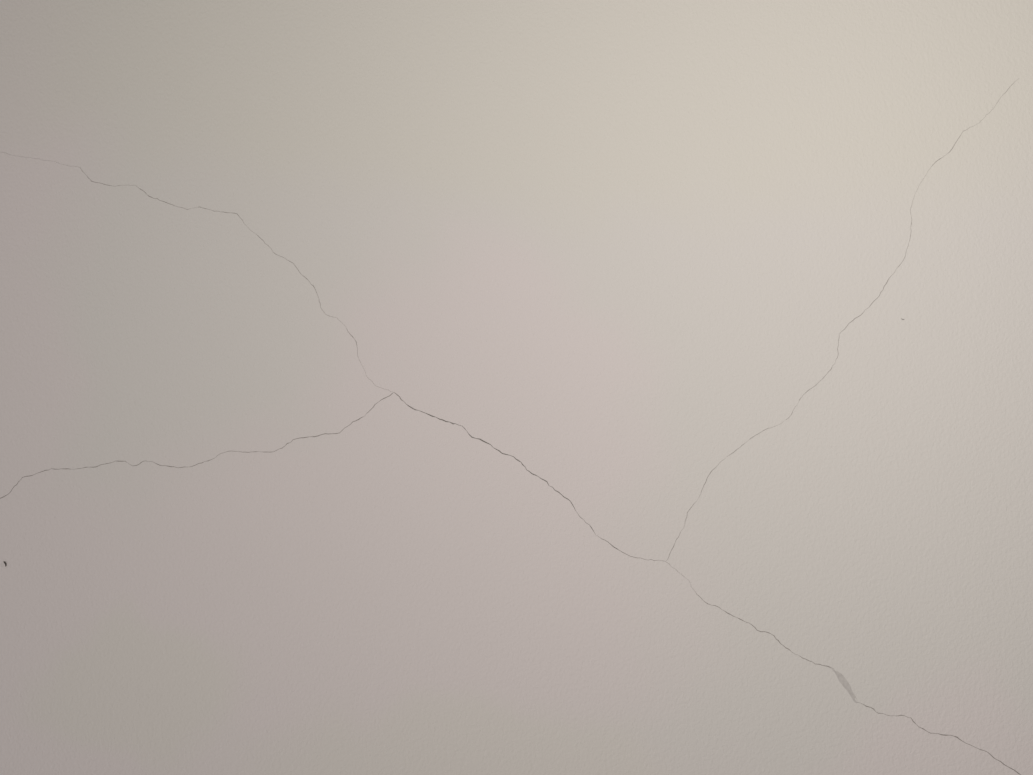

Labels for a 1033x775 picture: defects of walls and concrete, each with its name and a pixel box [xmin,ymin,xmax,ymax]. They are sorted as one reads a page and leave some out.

crack [0,78,1019,671]
crack [826,666,1026,775]